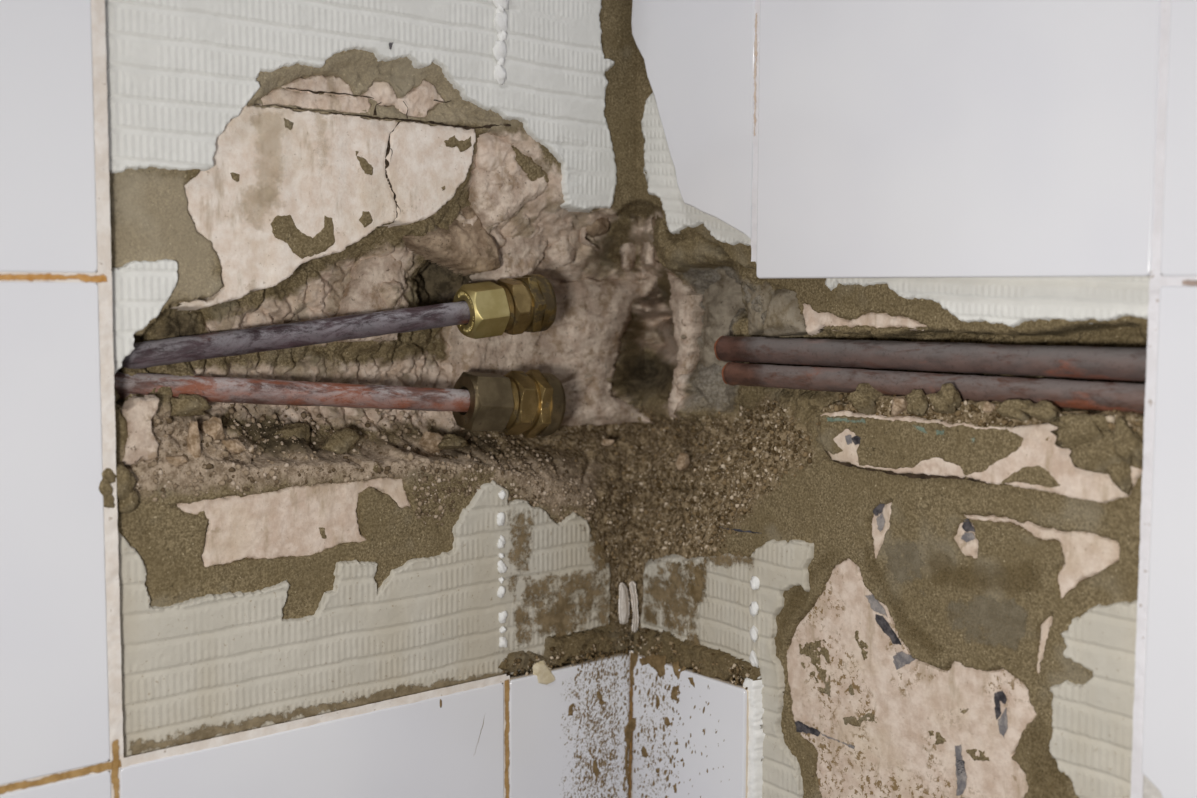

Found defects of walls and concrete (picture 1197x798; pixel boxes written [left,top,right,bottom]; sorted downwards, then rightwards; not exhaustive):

spalling [171,75,476,312]
crack [252,88,511,223]
spalling [803,303,927,336]
spalling [119,395,159,465]
spalling [177,477,411,567]
spalling [871,502,892,558]
spalling [954,514,1120,598]
peeling [532,660,555,685]
spalling [786,558,1037,798]
spalling [1037,616,1053,673]